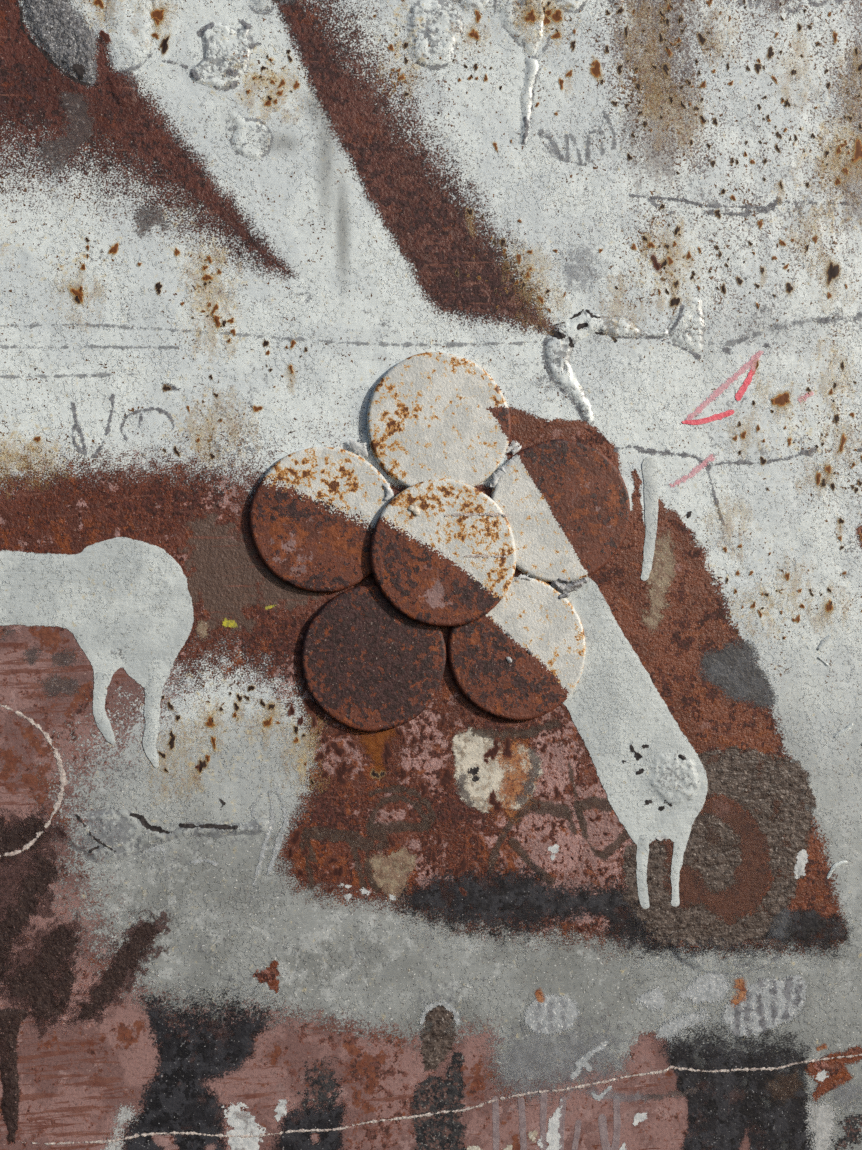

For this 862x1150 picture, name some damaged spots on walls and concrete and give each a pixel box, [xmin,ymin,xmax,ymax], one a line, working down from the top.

crack [249,0,289,16]
crack [559,0,588,13]
crack [493,0,551,145]
rust [606,0,733,138]
rust [0,0,299,286]
rust [246,0,566,339]
rust [731,95,816,181]
rust [632,224,711,306]
rust [716,236,817,309]
rust [0,404,847,961]
peeling [452,727,543,824]
rust [805,1043,862,1104]